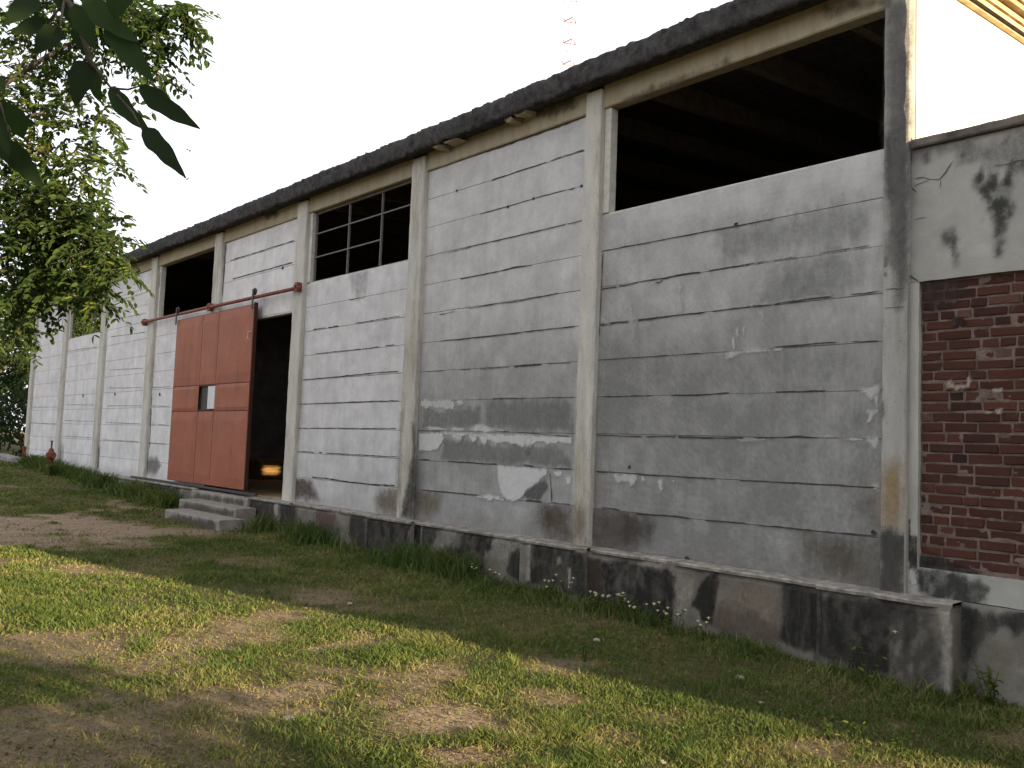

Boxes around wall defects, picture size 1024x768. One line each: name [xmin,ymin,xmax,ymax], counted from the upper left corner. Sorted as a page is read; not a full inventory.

water stain [851,0,928,301]
crack [911,138,953,220]
water stain [975,159,1024,255]
peeling [421,399,463,410]
peeling [419,424,572,502]
water stain [349,399,1024,692]